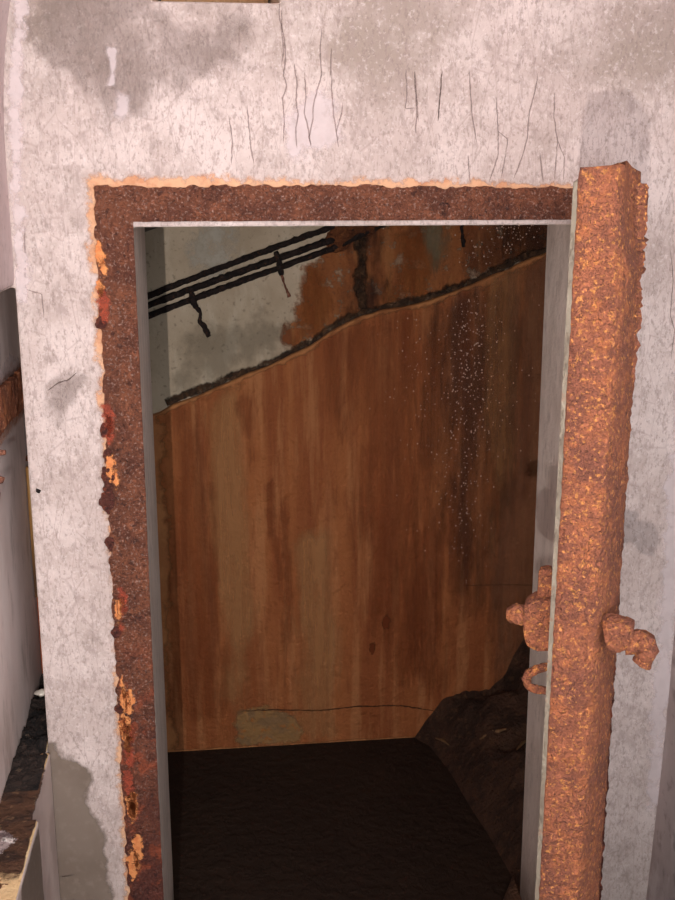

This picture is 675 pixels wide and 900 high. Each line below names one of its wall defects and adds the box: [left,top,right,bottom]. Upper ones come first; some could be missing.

crack [436,73,444,120]
rust [86,174,573,487]
rust [631,183,649,384]
rust [155,225,547,750]
rust [112,588,128,631]
peeling [0,830,17,854]
rust [113,672,144,900]